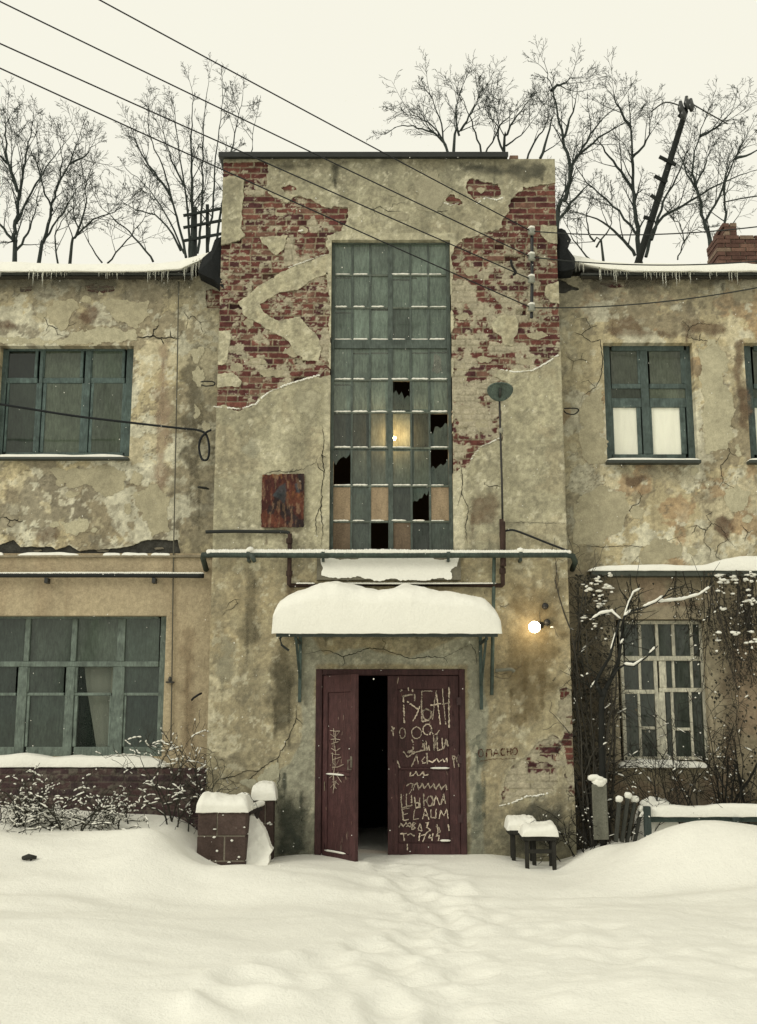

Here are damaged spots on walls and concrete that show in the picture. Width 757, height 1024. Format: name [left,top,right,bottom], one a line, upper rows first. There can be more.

spalling [206,162,348,412]
spalling [396,170,578,473]
peeling [569,388,609,465]
spalling [0,517,180,553]
peeling [50,465,143,498]
crack [667,449,752,558]
crack [307,639,477,664]
water stain [273,663,292,734]
spalling [499,687,575,807]
water stain [278,773,305,854]